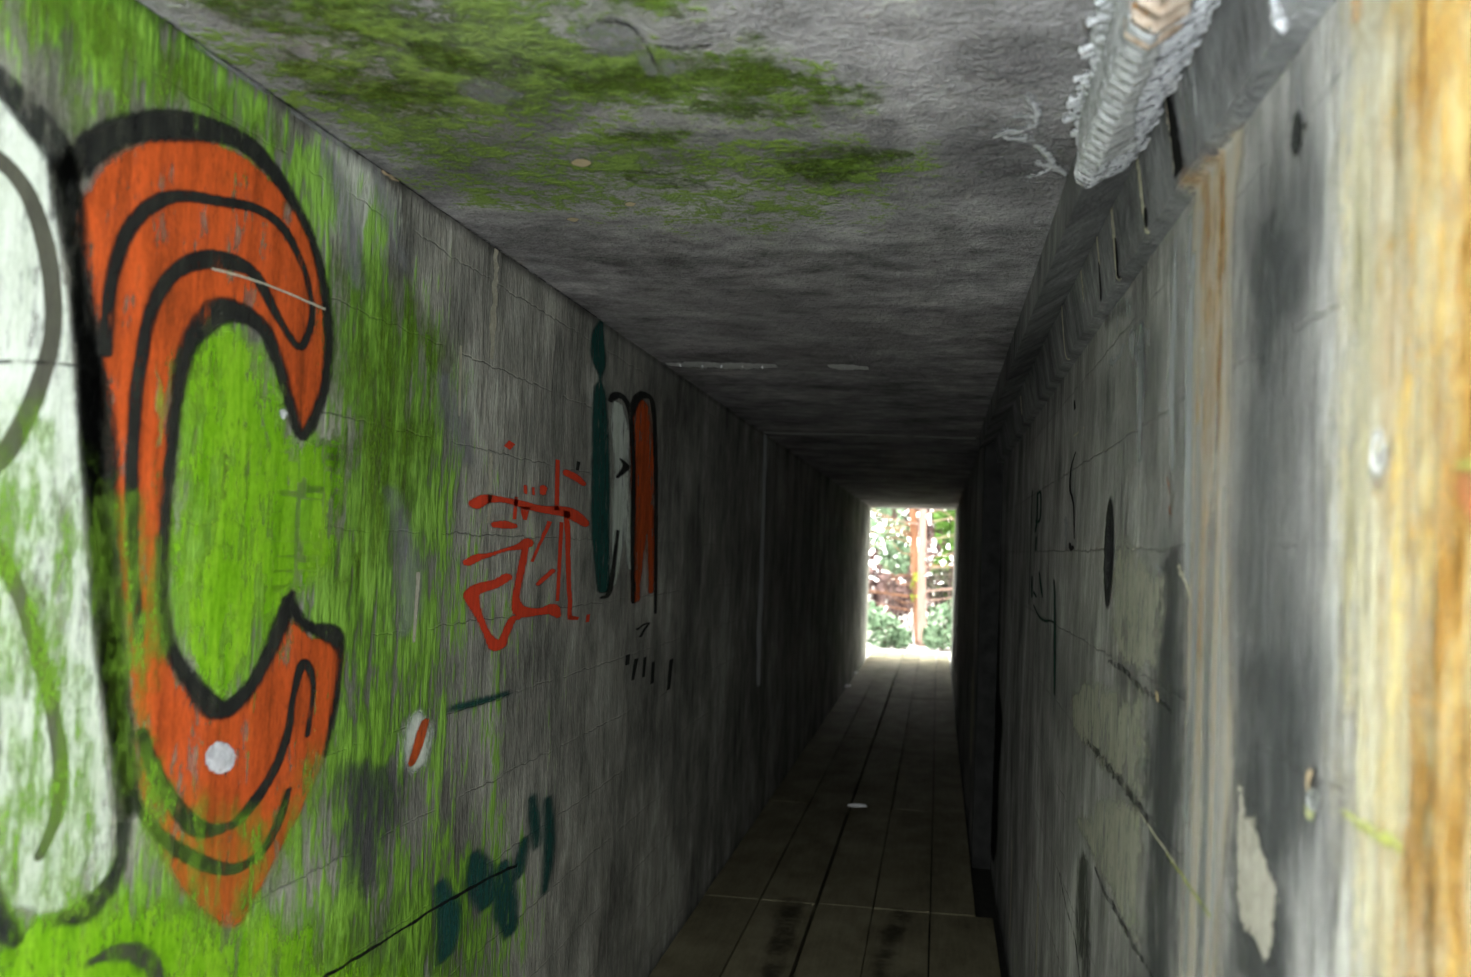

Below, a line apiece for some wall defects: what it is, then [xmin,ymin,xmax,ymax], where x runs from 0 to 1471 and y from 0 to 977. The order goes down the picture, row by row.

water stain [992,0,1221,189]
water stain [1270,0,1286,34]
water stain [1106,123,1300,977]
corrosion [1327,0,1471,977]
water stain [346,767,393,893]
water stain [1076,855,1090,977]
peeling [1236,784,1279,962]